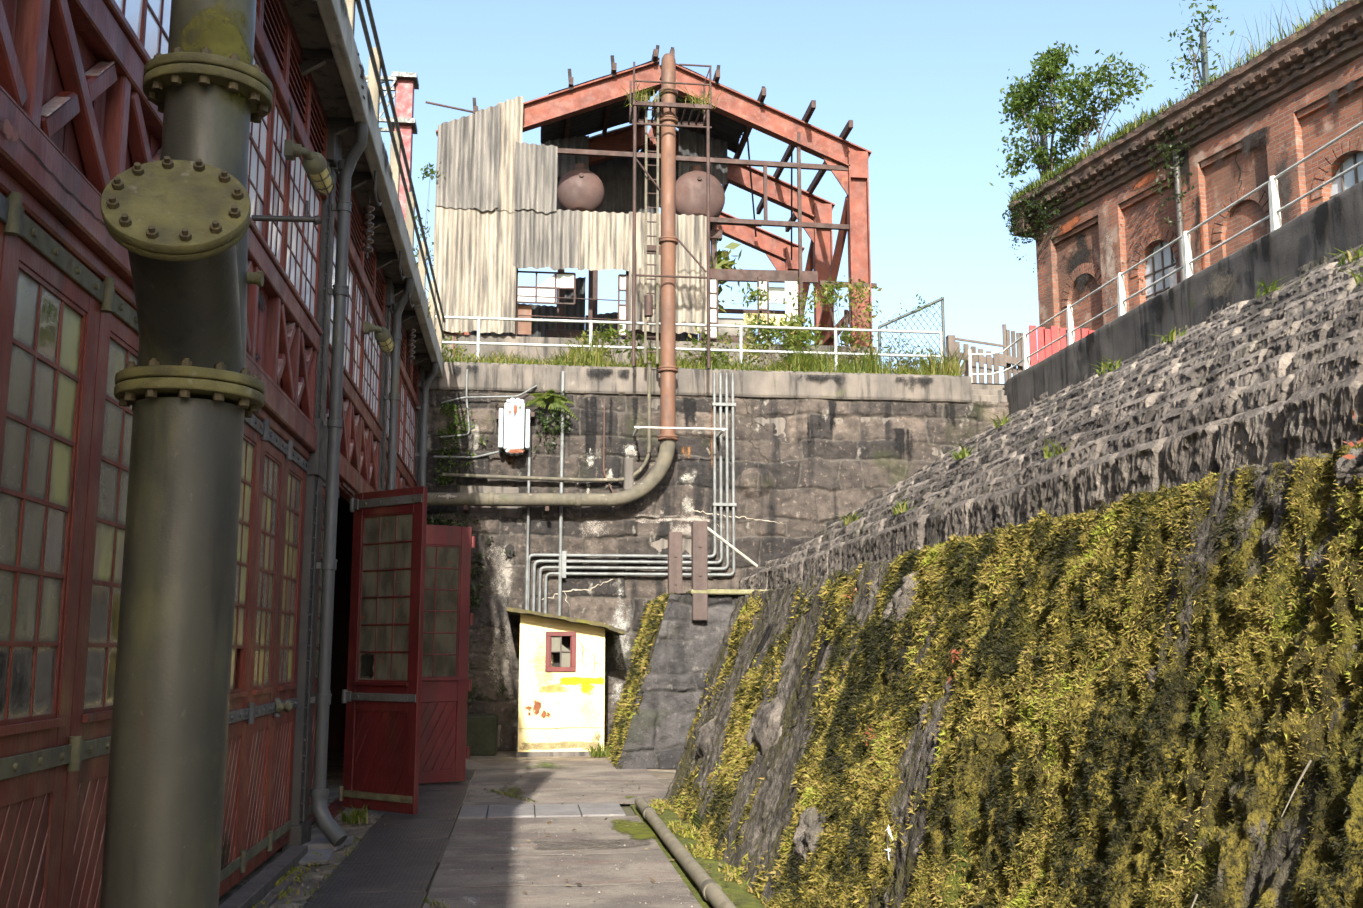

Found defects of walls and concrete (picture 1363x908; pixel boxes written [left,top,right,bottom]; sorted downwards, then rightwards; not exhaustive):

water stain [1252,152,1293,261]
water stain [1312,196,1341,244]
water stain [1067,234,1093,292]
peeling [525,700,551,718]